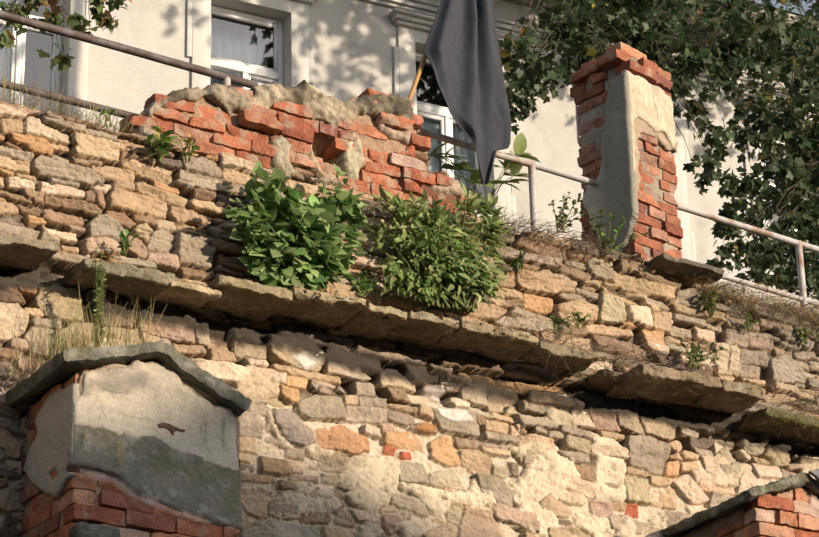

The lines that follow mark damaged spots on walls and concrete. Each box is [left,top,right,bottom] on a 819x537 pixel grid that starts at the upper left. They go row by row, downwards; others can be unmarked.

flaking render [582,70,678,252]
water stain [88,472,156,505]
flaking render [23,360,240,498]